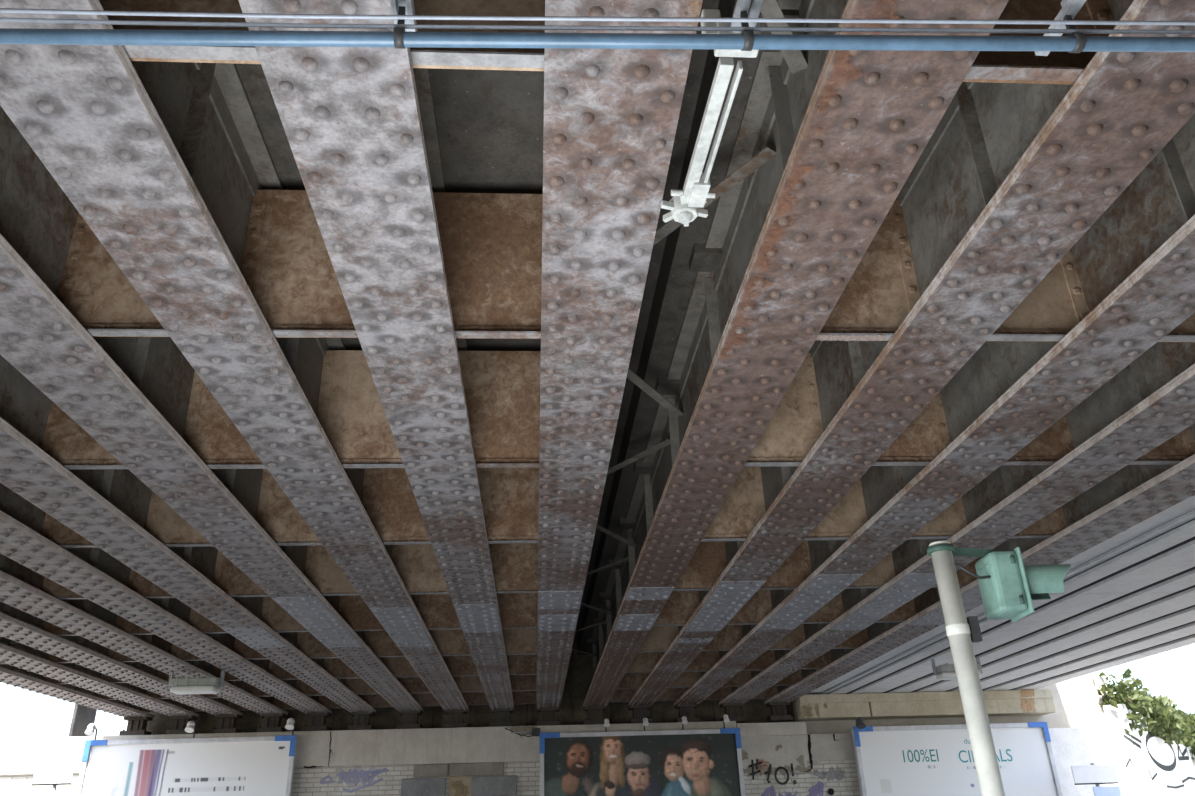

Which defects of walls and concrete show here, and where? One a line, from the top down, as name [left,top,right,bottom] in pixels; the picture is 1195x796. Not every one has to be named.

crack [304,732,333,768]
crack [805,734,837,772]